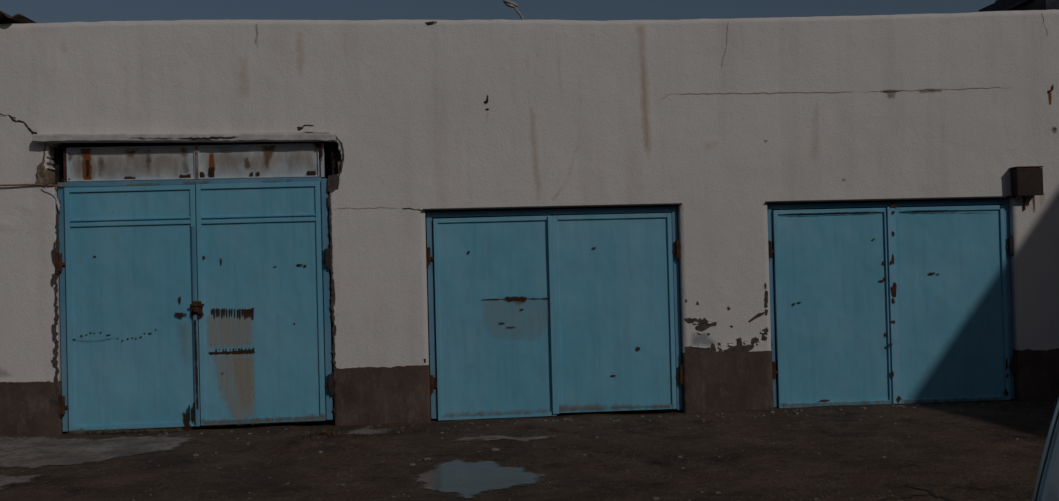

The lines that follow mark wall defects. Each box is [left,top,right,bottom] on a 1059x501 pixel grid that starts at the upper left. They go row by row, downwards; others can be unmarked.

crack [0,113,37,134]
rust [57,148,102,188]
rust [180,153,215,184]
rust [246,145,275,176]
rust [307,142,323,176]
peeling [684,283,769,354]
rust [72,297,325,434]